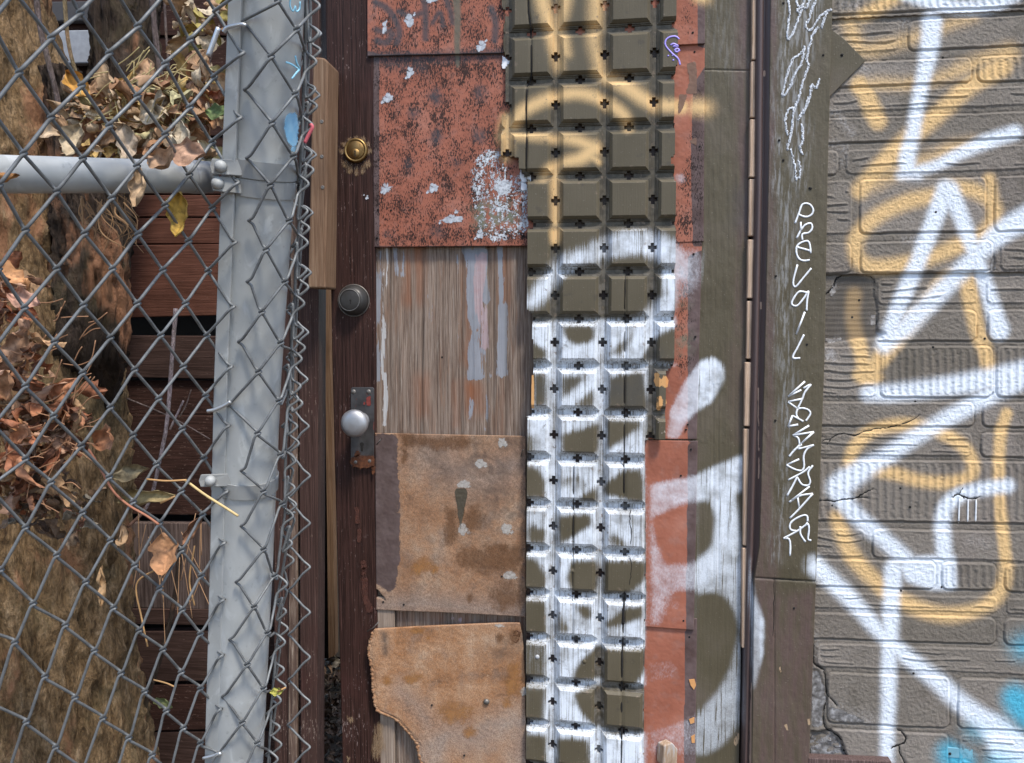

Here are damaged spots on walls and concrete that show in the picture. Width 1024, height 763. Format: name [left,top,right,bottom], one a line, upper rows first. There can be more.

peeling [472,149,529,242]
crack [823,415,919,445]
rust [350,450,376,475]
crack [820,489,872,502]
spalling [810,671,864,754]